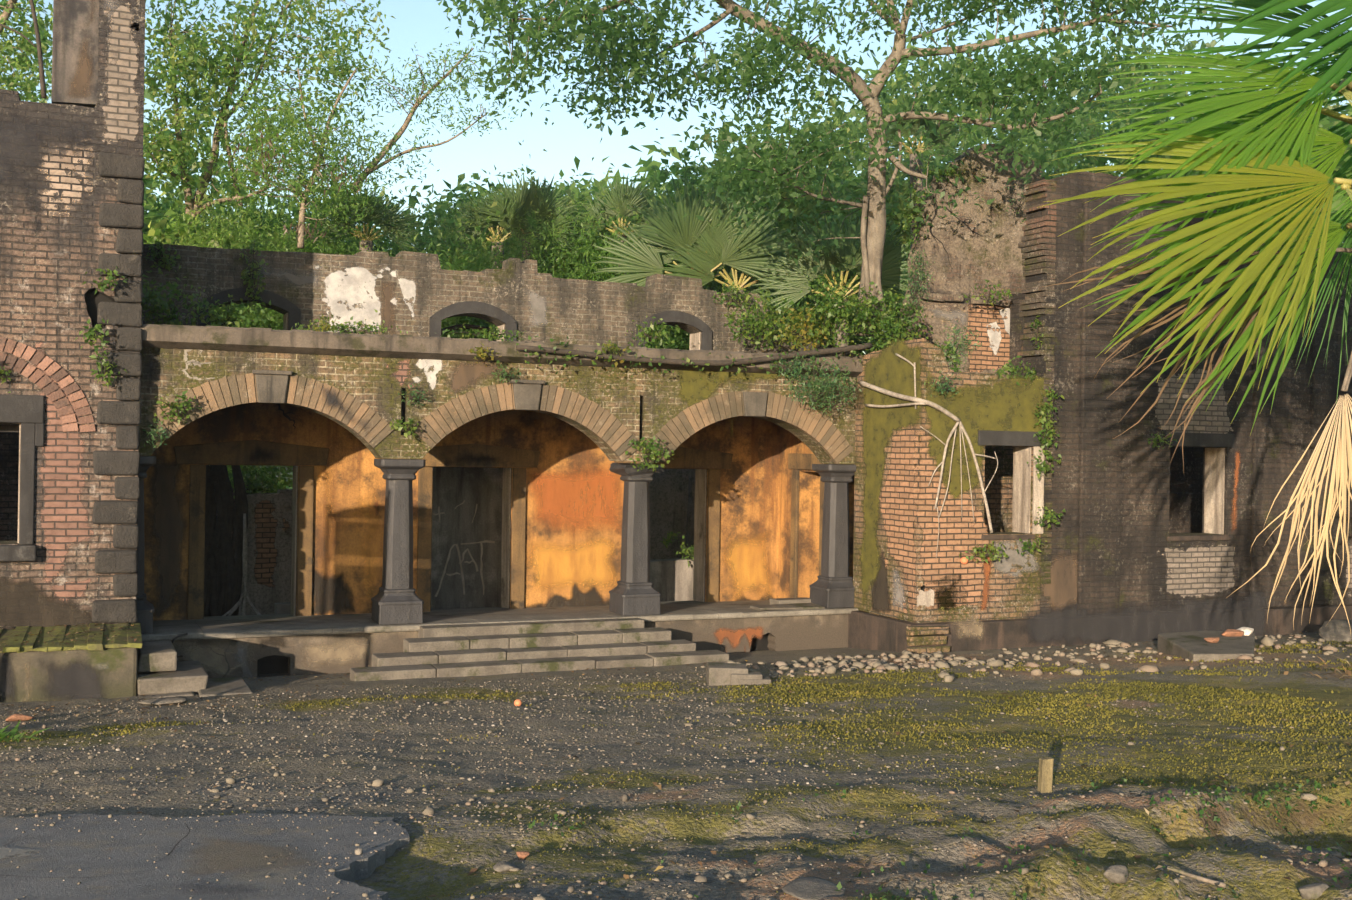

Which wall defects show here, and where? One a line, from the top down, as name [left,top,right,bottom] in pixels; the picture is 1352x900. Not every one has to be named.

peeling [315,265,416,332]
peeling [386,359,442,389]
flaking render [878,179,1057,614]
flaking render [1155,367,1233,438]
leakage [150,458,187,616]
leakage [312,571,354,615]
leakage [526,585,610,608]
flaking render [1156,544,1235,599]